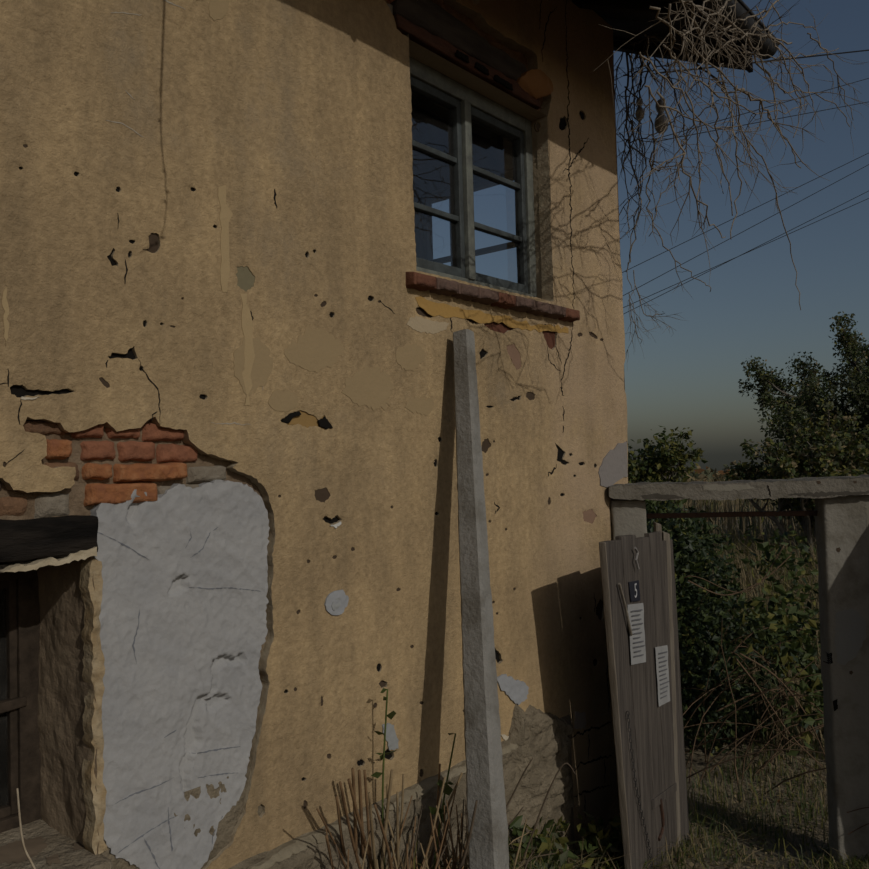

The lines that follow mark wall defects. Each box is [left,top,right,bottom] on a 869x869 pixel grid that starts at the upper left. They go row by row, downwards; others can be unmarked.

crack [541,1,589,432]
crack [0,368,22,424]
crack [138,359,161,421]
flaking render [280,410,333,430]
flaking render [23,420,226,506]
flaking render [0,481,70,519]